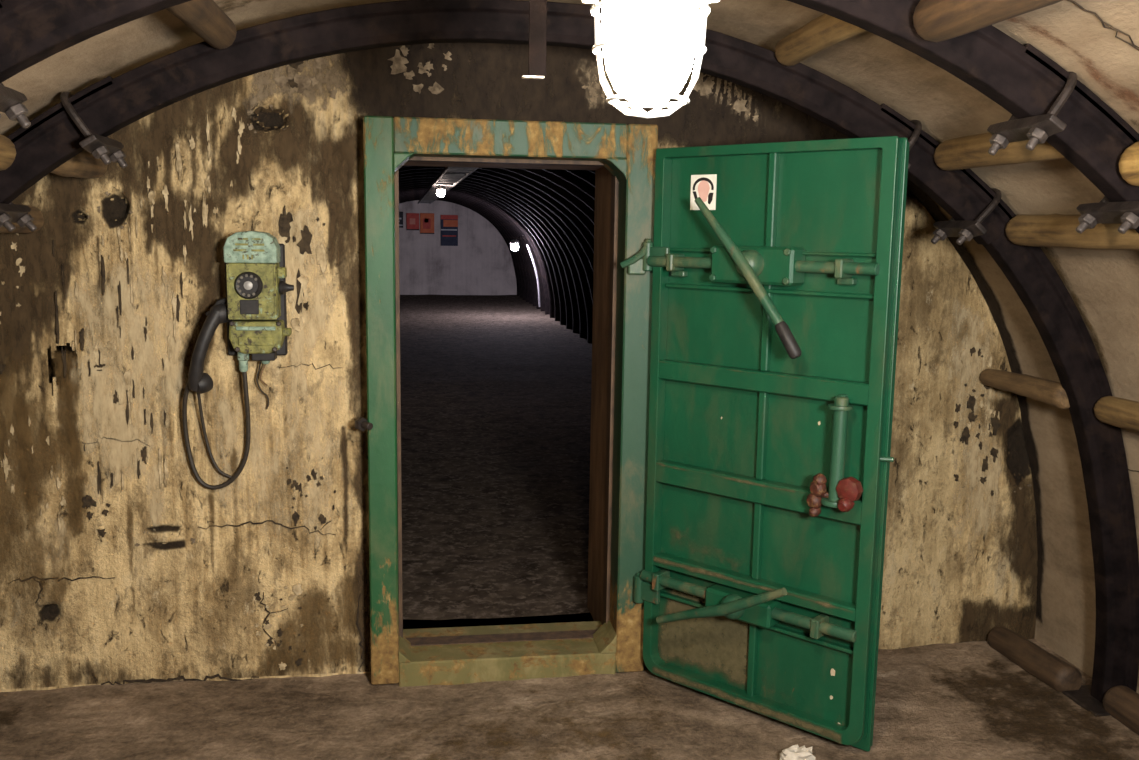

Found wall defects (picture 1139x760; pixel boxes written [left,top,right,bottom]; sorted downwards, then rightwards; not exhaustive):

crack [1067,0,1139,51]
peeling [388,43,452,95]
peeling [580,64,630,107]
peeling [688,70,758,122]
damp [0,43,849,600]
damp [947,237,1022,374]
crack [199,520,336,535]
damp [223,426,370,678]
damp [959,394,1044,643]
crack [8,576,115,603]
crack [260,592,288,643]
damp [932,660,1139,760]